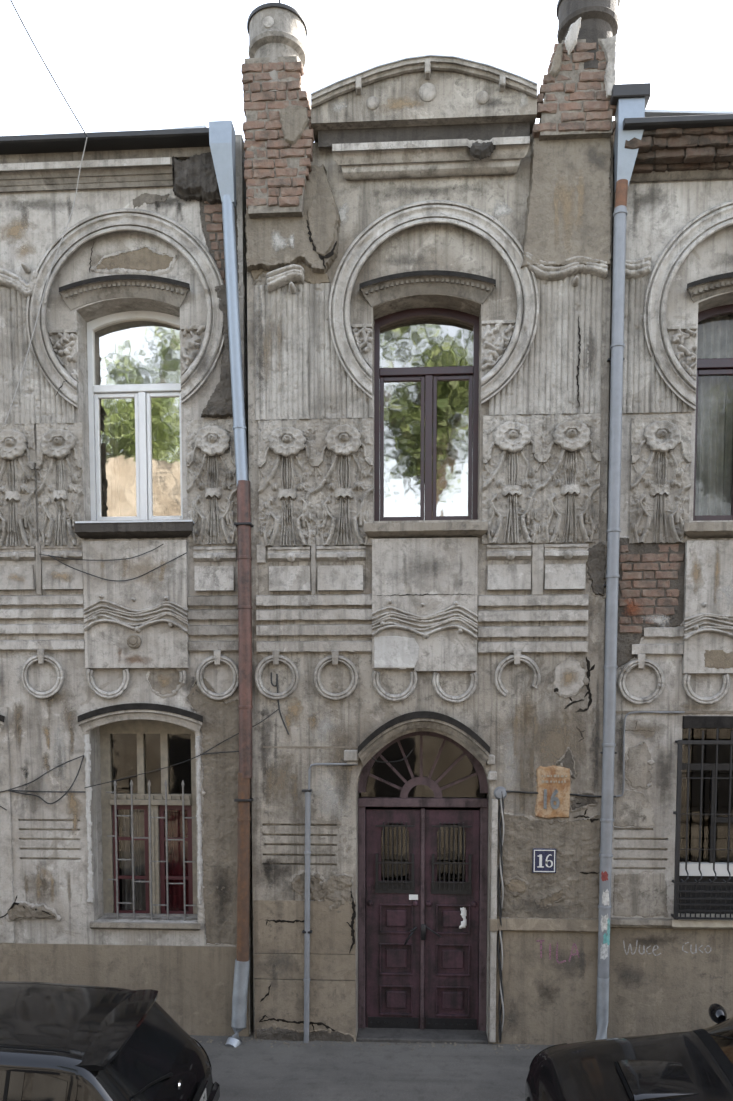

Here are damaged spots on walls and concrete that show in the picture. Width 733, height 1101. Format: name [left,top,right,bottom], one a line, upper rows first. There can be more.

flaking render [532,17,617,138]
flaking render [198,61,337,420]
flaking render [584,536,685,671]
crack [266,918,305,926]
crack [346,891,356,954]
crack [259,985,344,1035]